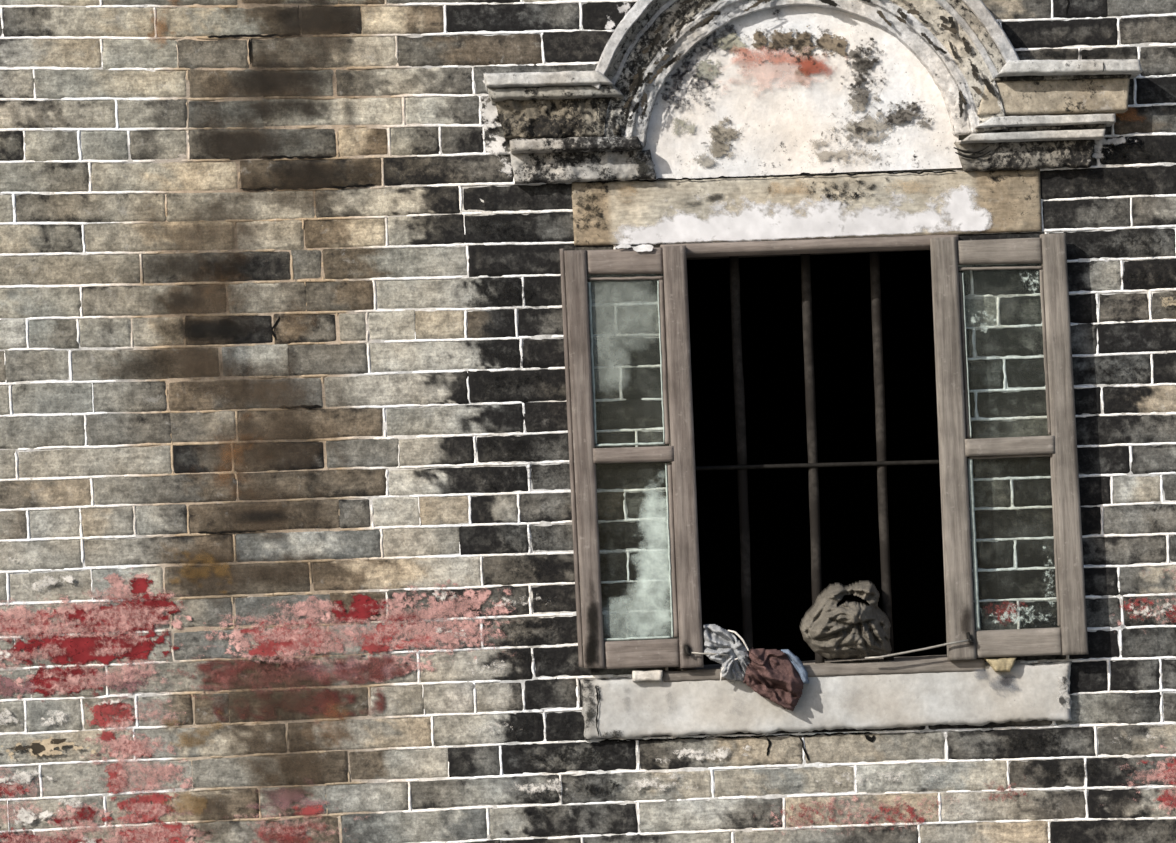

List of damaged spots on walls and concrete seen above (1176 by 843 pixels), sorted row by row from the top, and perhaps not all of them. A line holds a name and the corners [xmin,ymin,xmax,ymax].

leakage [200,57,320,157]
peeling [623,0,721,121]
peeling [695,25,878,105]
leakage [656,9,934,167]
peeling [885,100,935,127]
peeling [862,0,997,118]
leakage [1045,49,1125,57]
leakage [811,178,889,204]
leakage [156,207,313,469]
leakage [477,428,556,489]
leakage [232,487,287,530]
spalling [2,736,97,759]